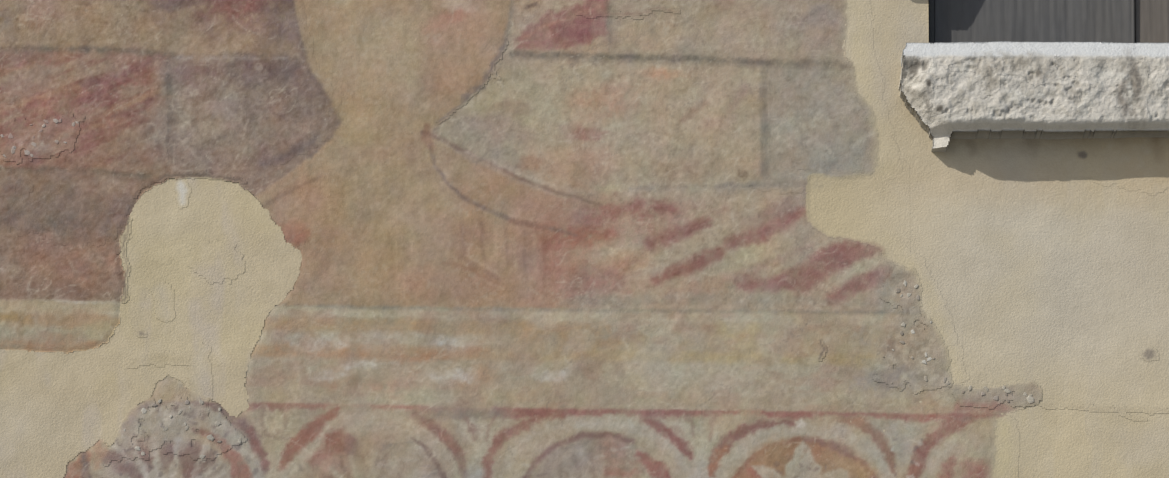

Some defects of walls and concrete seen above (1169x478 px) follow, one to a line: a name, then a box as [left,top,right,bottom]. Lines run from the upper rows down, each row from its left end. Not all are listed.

flaking render [0,178,302,478]